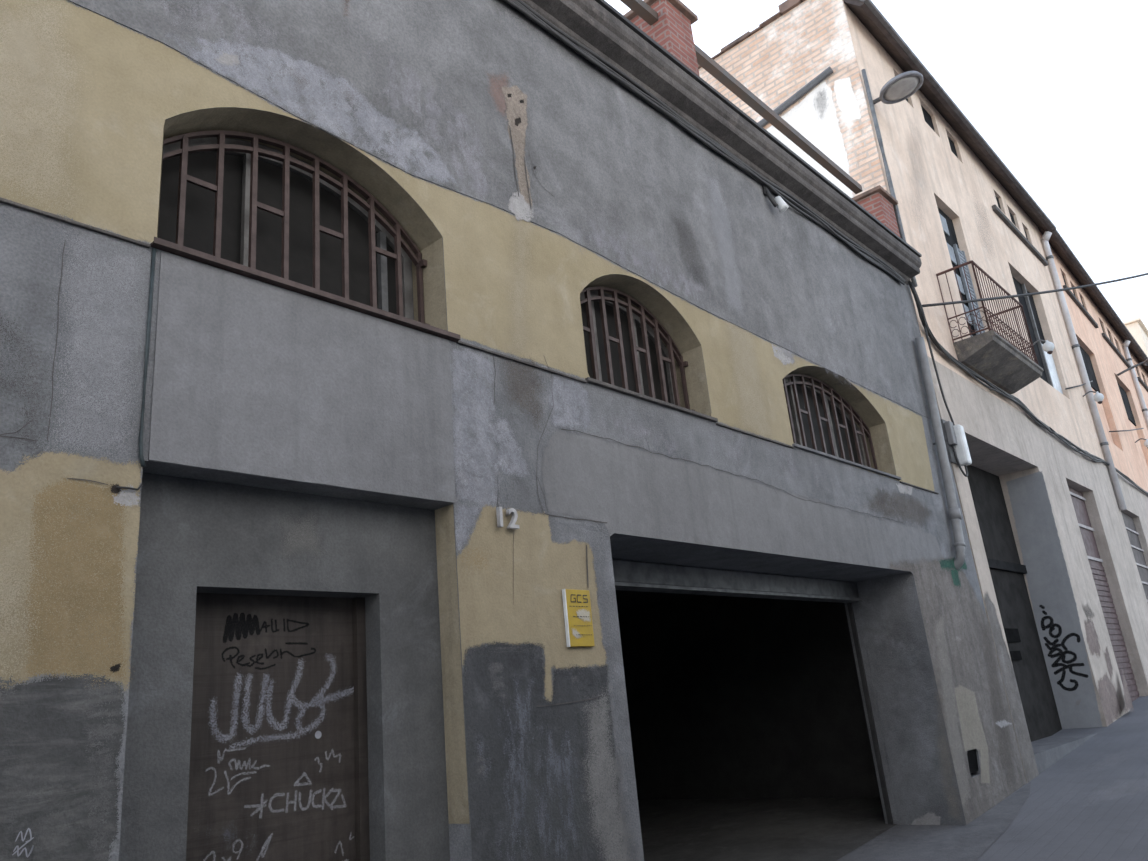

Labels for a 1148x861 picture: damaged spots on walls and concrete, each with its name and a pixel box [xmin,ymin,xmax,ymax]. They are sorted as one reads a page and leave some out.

flaking render [487,70,536,222]
peeling [0,451,143,692]
peeling [451,346,678,703]
crack [536,357,903,523]